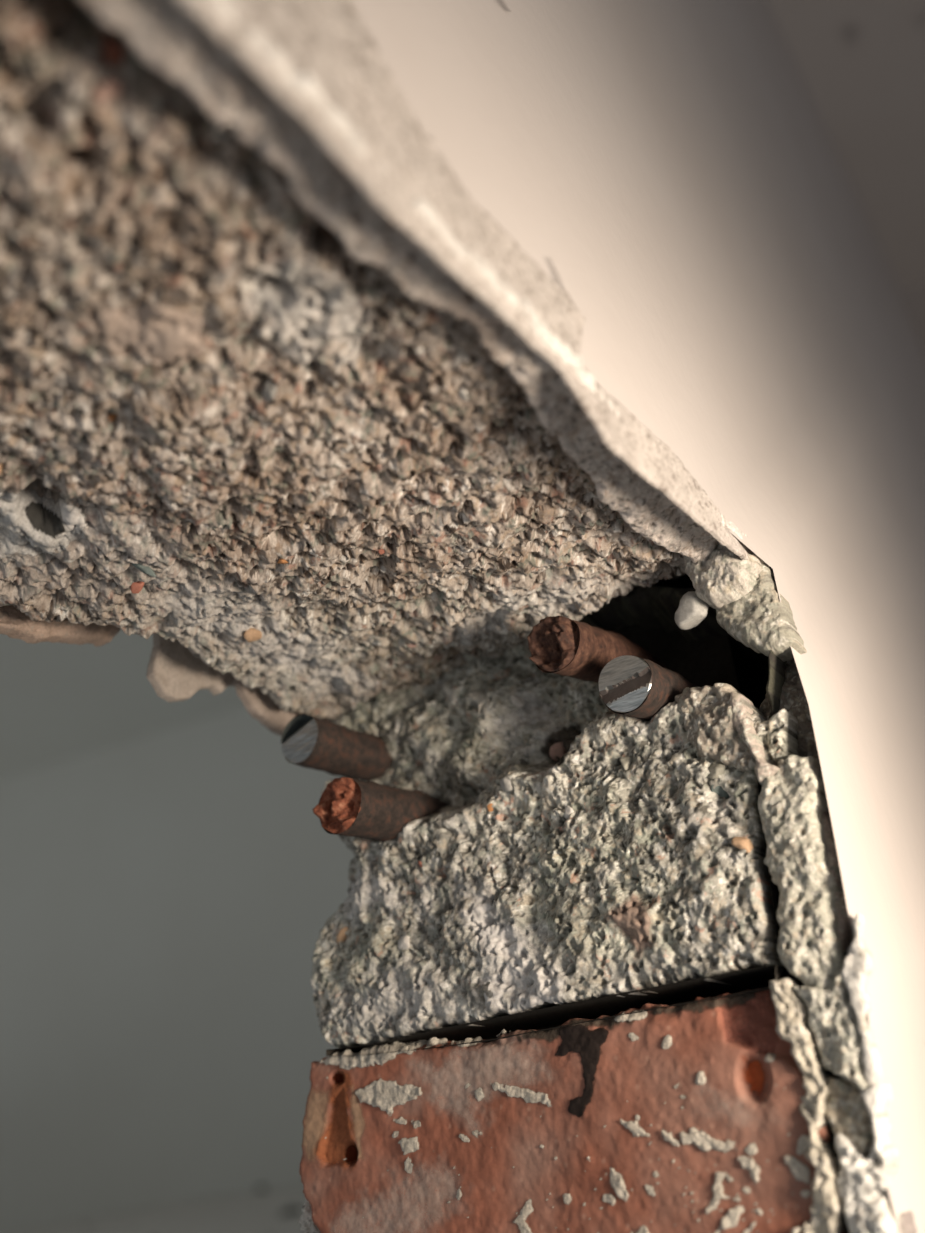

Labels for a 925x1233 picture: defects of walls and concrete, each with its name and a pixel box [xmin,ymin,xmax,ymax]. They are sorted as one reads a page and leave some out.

peeling [146,633,304,736]
spalling [579,585,787,719]
spalling [541,724,581,767]
crack [326,834,805,1056]
spalling [721,993,778,1054]
rust [302,1071,365,1167]
crack [823,1067,843,1159]